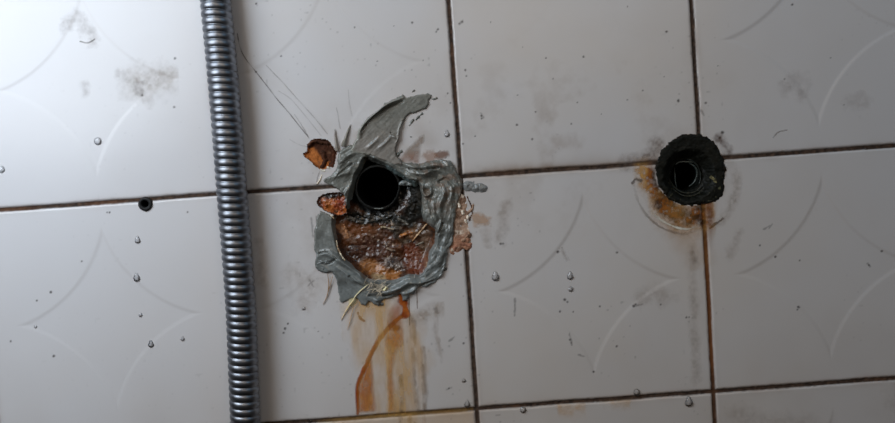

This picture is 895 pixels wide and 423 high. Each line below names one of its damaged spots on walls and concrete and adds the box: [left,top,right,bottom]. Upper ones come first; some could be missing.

spalling [303,139,337,184]
spalling [317,176,435,280]
corrosion [638,166,713,228]
corrosion [355,294,410,415]